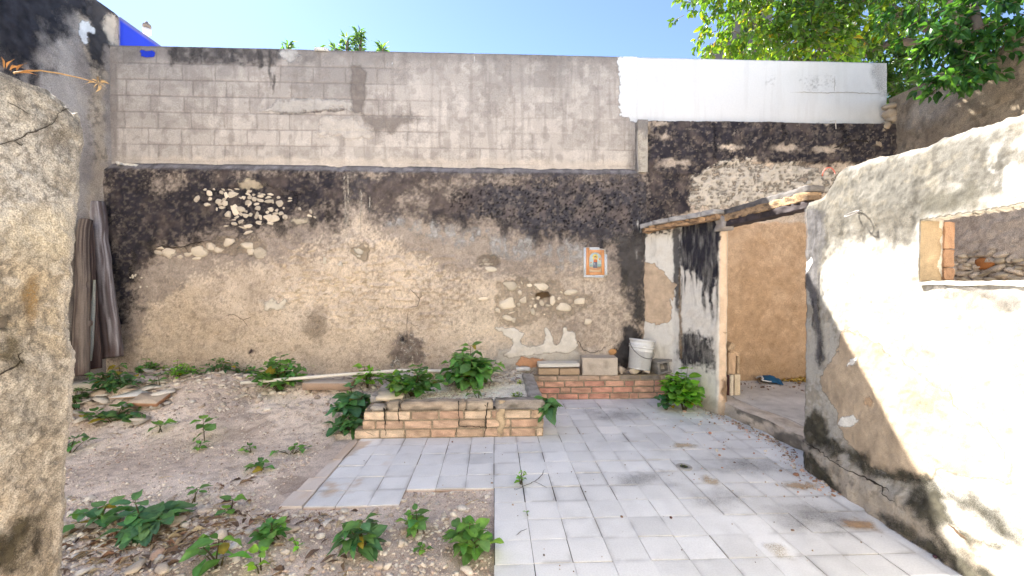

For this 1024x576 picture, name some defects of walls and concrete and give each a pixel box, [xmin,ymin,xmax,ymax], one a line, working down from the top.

crack [0,101,68,146]
leakage [350,66,412,133]
flaking render [154,178,316,260]
leakage [103,121,912,373]
flaking render [478,255,594,370]
flaking render [643,262,677,325]
crack [803,441,895,502]